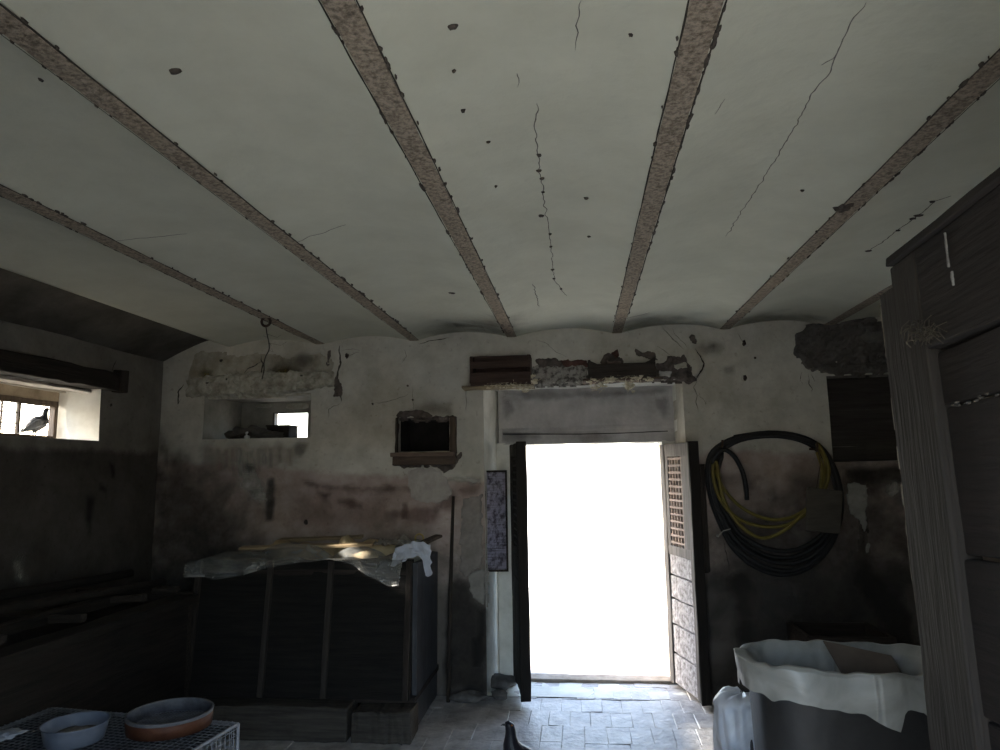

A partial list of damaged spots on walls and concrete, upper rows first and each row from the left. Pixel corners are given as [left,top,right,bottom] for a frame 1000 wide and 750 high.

crack [728,3,866,233]
crack [532,105,567,306]
crack [865,196,950,252]
peeling [188,350,343,397]
crack [328,346,360,418]
flaking render [535,358,588,368]
spalling [600,349,623,364]
spalling [793,305,888,379]
water stain [151,458,241,591]
peeling [845,482,870,553]